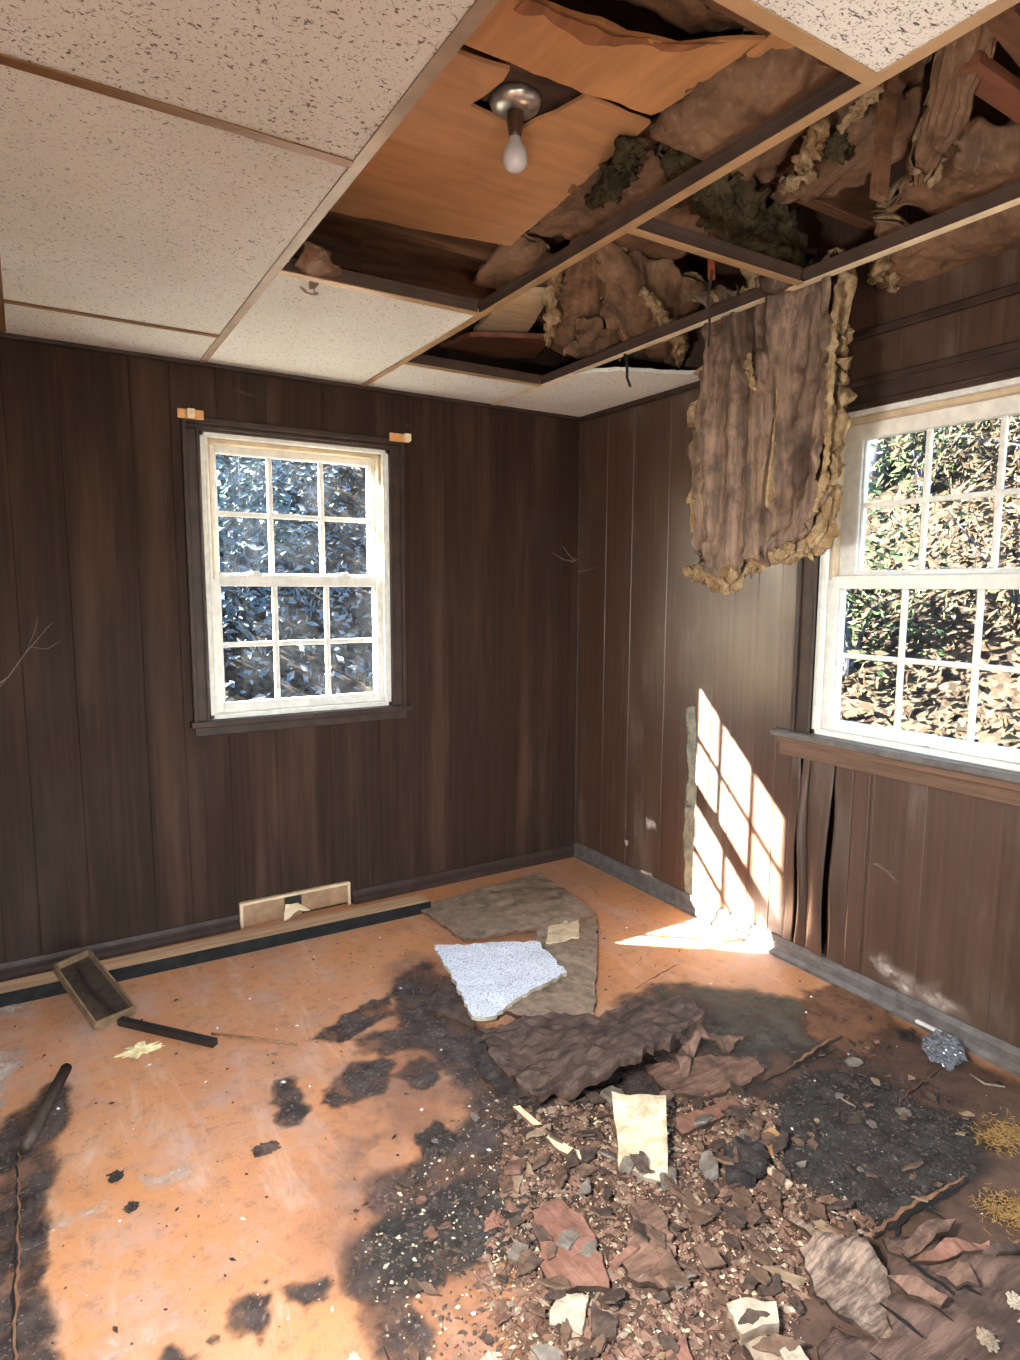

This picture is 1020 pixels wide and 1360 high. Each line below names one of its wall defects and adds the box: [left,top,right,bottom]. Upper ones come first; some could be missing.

peeling [295,241,342,295]
damp [0,1004,24,1014]
damp [207,962,1020,1360]
damp [0,1083,70,1360]
damp [161,1346,193,1360]